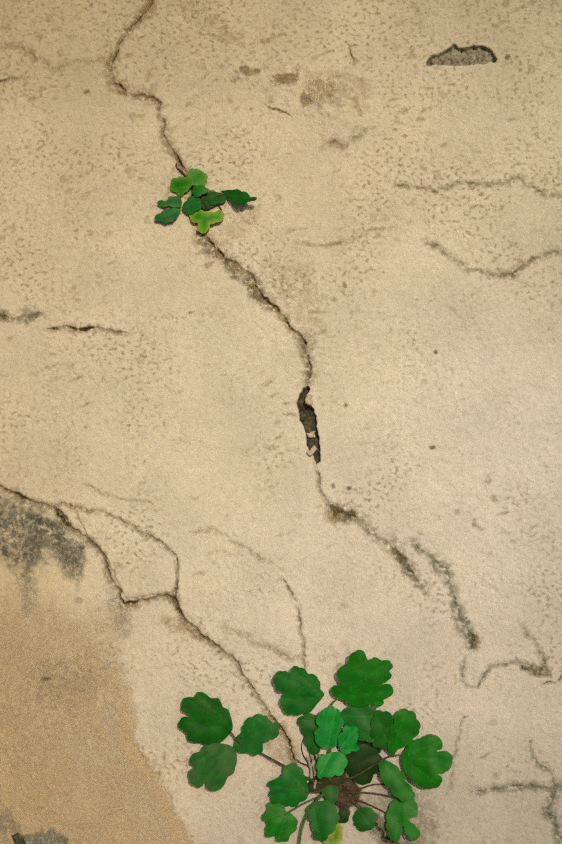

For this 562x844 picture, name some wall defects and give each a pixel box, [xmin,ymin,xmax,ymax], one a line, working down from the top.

crack [108,0,192,189]
spalling [427,45,509,66]
crack [0,312,93,331]
crack [199,233,312,389]
water stain [0,496,83,577]
crack [318,474,477,649]
crack [4,488,297,763]
crack [478,658,562,687]
water stain [0,634,191,844]
spalling [12,829,68,844]
crack [358,804,408,844]